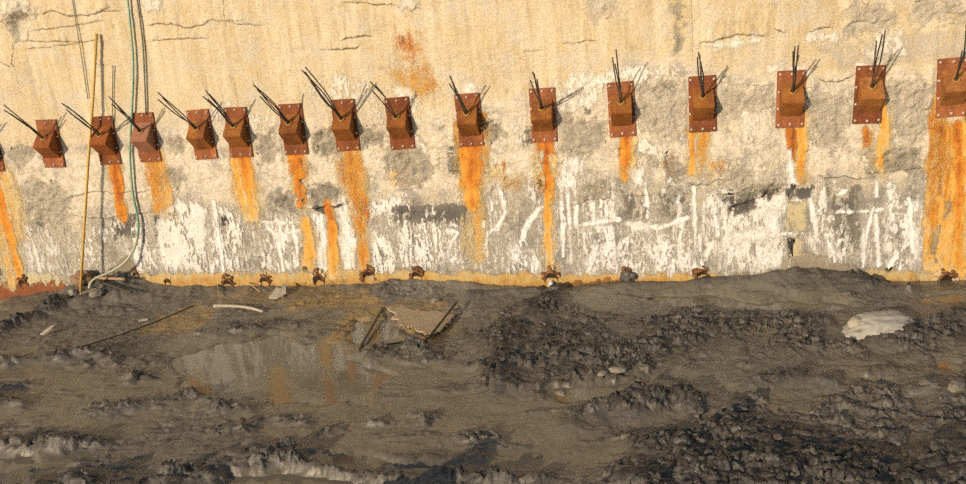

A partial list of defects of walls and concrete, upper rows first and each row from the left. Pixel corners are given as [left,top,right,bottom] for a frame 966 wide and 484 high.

corrosion [0,165,27,291]
corrosion [107,164,127,223]
corrosion [230,157,262,223]
corrosion [287,154,344,280]
corrosion [335,150,374,281]
leakage [0,150,951,300]
corrosion [453,111,560,272]
corrosion [618,136,638,183]
corrosion [785,112,813,188]
corrosion [862,87,893,177]
corrosion [921,94,966,278]